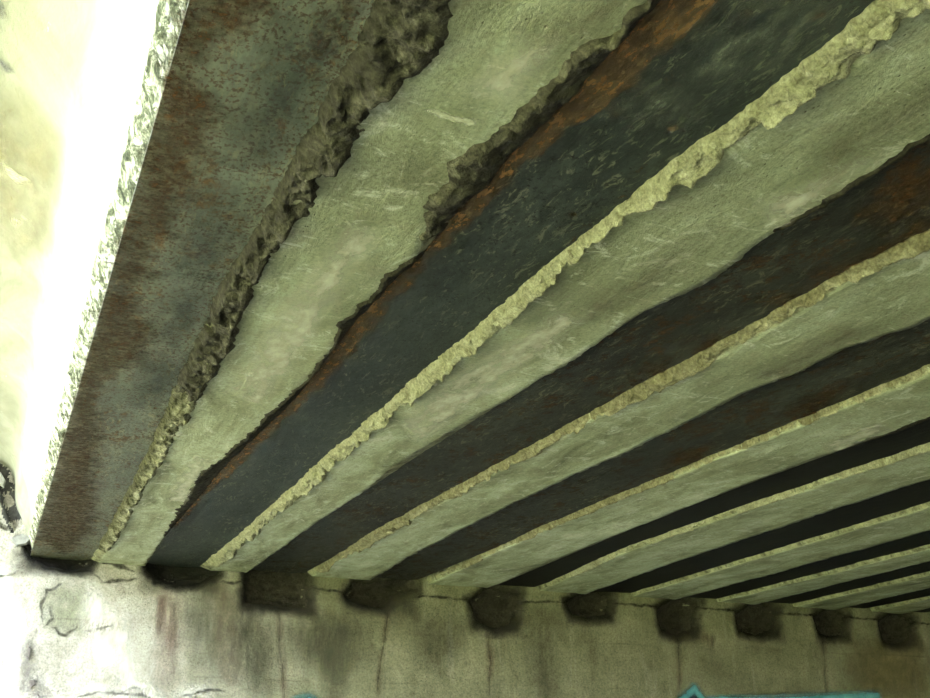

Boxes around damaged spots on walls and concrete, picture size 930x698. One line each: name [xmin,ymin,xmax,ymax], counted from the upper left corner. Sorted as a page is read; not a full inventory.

peeling [4,164,31,184]
spalling [20,0,189,574]
rust [33,0,272,554]
rust [174,0,717,527]
spalling [99,0,930,614]
peeling [40,587,72,636]
crack [84,690,151,698]